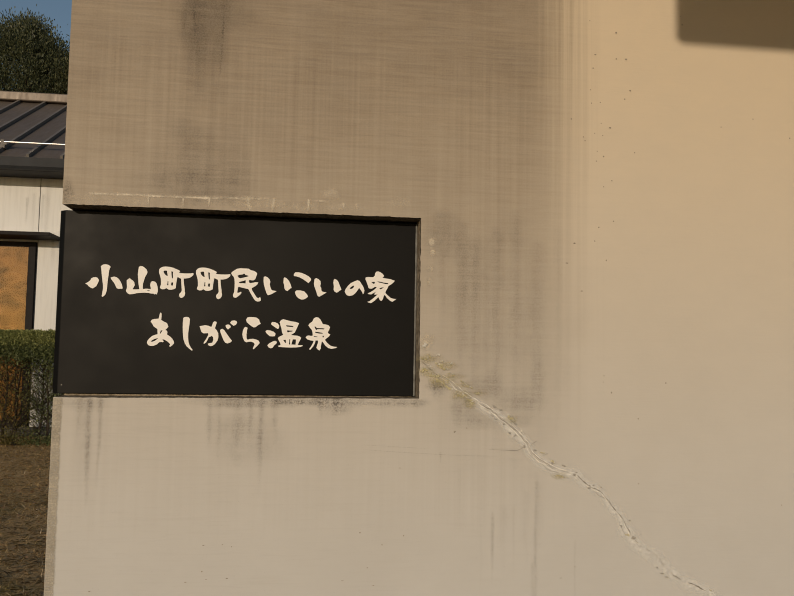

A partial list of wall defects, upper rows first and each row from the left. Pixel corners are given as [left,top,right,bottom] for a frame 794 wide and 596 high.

damp [90,192,217,204]
crack [420,343,715,596]